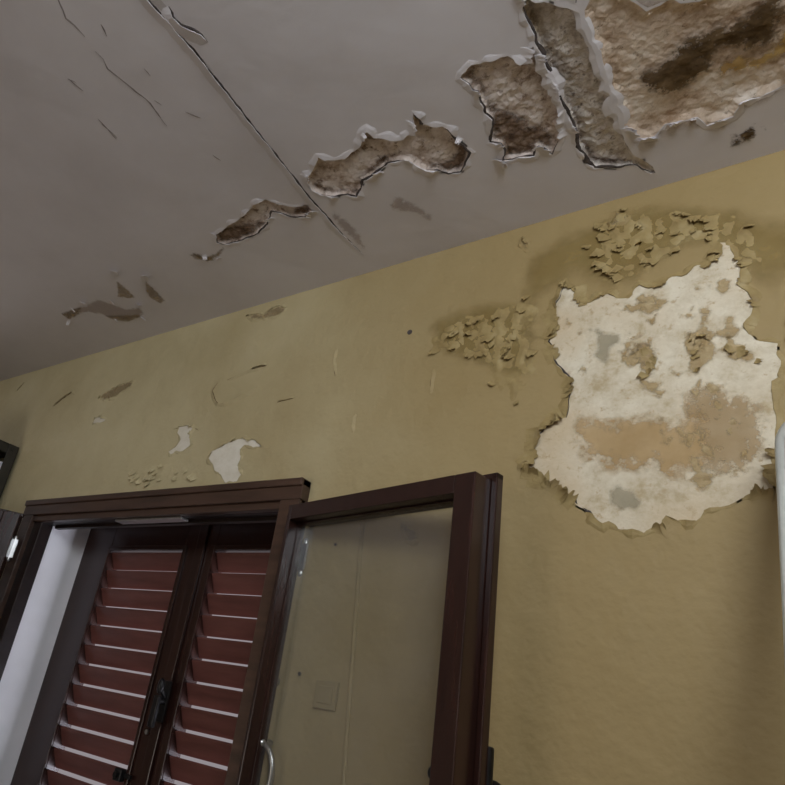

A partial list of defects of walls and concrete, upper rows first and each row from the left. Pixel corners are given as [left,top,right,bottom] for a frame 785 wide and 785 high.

crack [58,0,167,126]
crack [139,0,363,256]
spalling [300,111,476,201]
flaking render [455,0,785,177]
water stain [640,0,785,93]
spalling [192,198,319,261]
flaking render [109,271,146,322]
peeling [514,241,785,539]
peeling [168,423,195,457]
peeling [206,435,261,484]